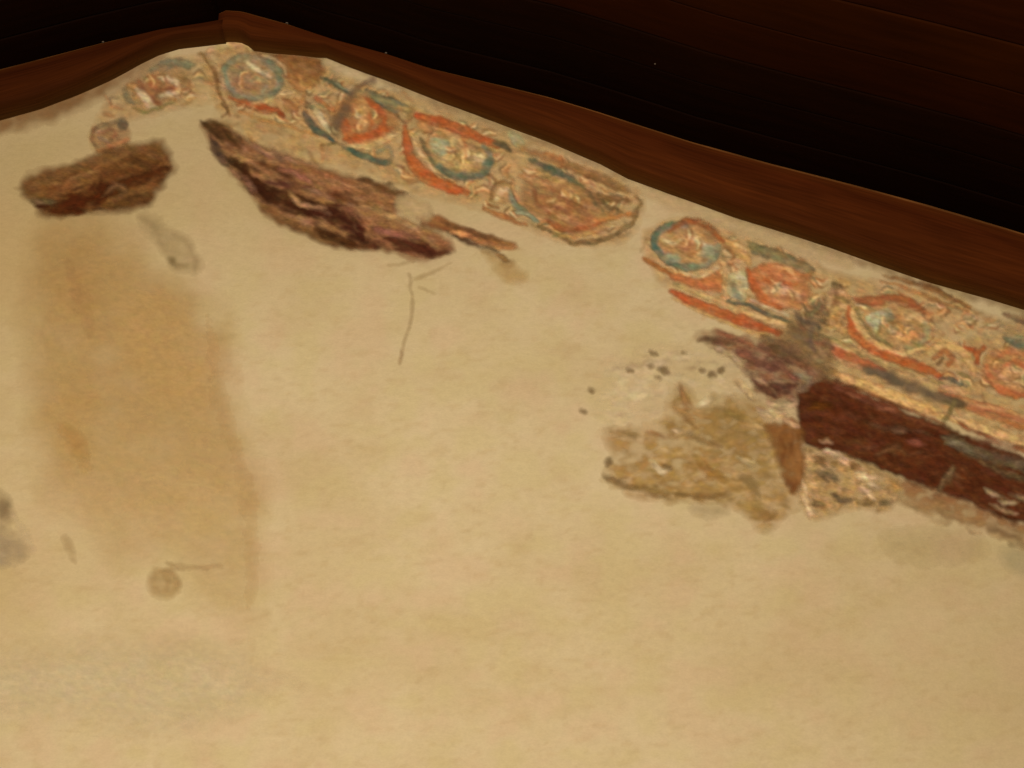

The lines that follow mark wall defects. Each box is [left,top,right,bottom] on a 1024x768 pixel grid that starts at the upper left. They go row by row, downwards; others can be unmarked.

spalling [22,142,171,216]
spalling [202,121,515,262]
damp [48,246,210,420]
spalling [702,330,1024,522]